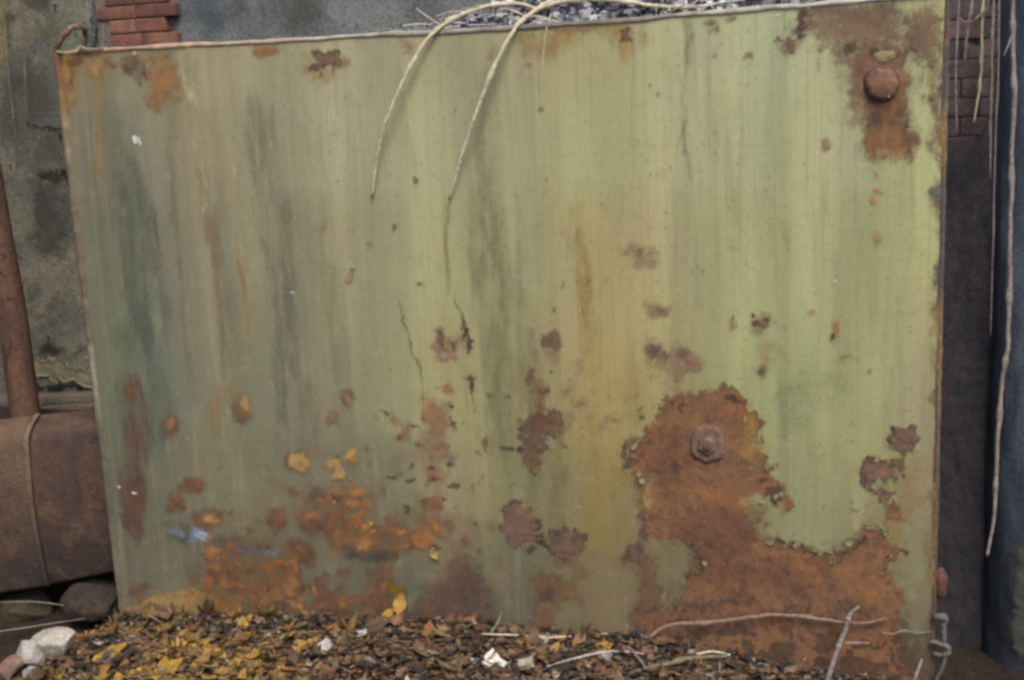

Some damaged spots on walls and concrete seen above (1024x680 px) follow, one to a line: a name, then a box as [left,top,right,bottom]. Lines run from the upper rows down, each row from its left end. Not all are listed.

corrosion [774,4,946,159]
corrosion [117,380,150,542]
corrosion [167,478,231,530]
corrosion [283,450,310,472]
corrosion [309,384,460,555]
corrosion [477,408,574,476]
corrosion [498,499,588,562]
corrosion [621,381,933,680]
corrosion [124,541,396,617]